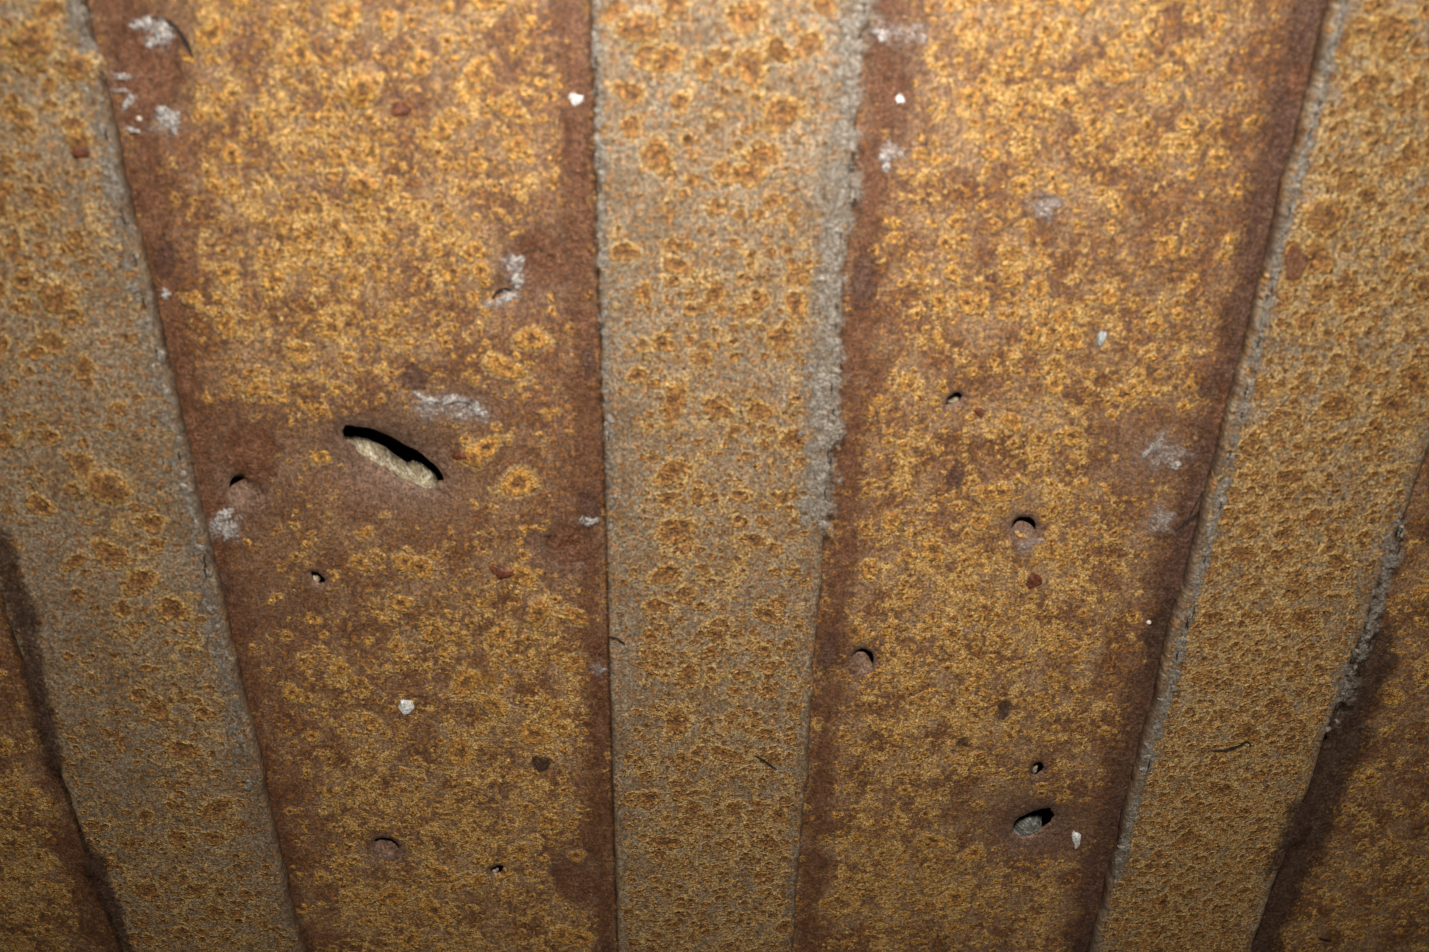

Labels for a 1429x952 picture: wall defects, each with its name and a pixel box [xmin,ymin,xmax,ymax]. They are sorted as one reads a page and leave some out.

rust [338,61,412,120]
rust [1285,188,1348,280]
rust [0,0,314,952]
spalling [344,435,439,489]
rust [452,438,491,474]
rust [502,0,673,952]
rust [798,0,915,952]
crack [1173,492,1222,533]
rust [1026,572,1042,587]
crack [1213,741,1252,752]
rust [1251,626,1397,952]
spalling [1013,812,1042,836]